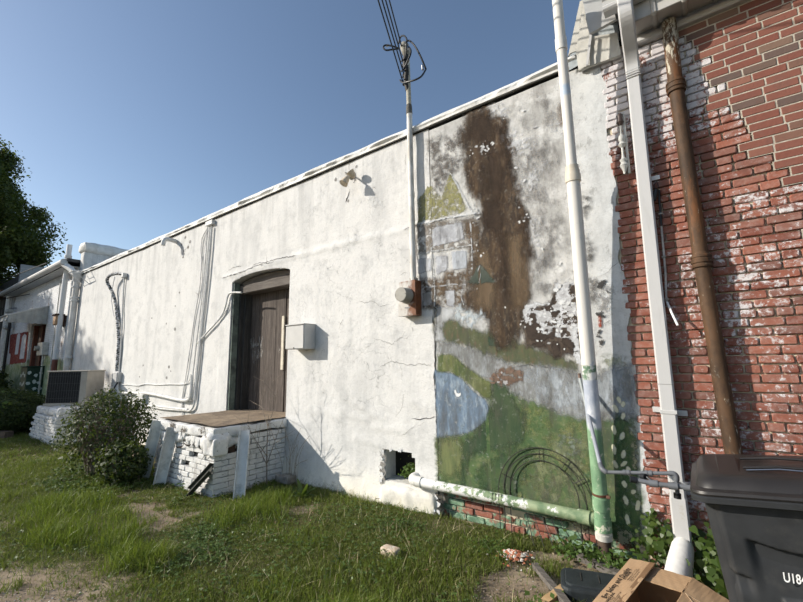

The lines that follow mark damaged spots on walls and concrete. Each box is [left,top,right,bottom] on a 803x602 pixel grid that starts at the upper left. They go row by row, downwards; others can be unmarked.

damp [427,106,558,351]
flaking render [379,448,401,484]
crack [363,298,439,481]
peeling [520,281,581,364]